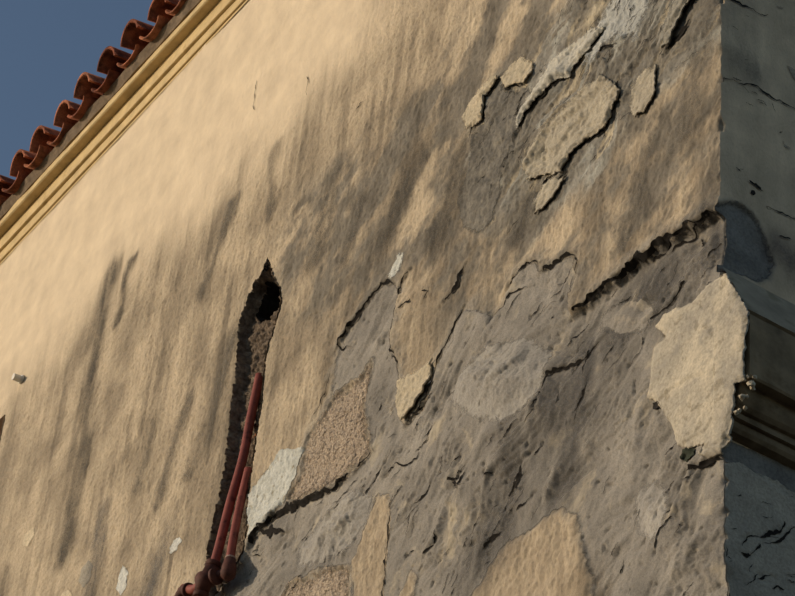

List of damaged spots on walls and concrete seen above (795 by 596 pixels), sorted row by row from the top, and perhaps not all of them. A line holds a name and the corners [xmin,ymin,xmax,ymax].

flaking render [660,0,690,49]
flaking render [457,26,604,234]
flaking render [522,73,621,215]
crack [469,0,697,210]
flaking render [630,64,658,118]
crack [723,77,795,110]
crack [736,167,795,219]
flaking render [222,201,795,596]
crack [726,502,795,590]